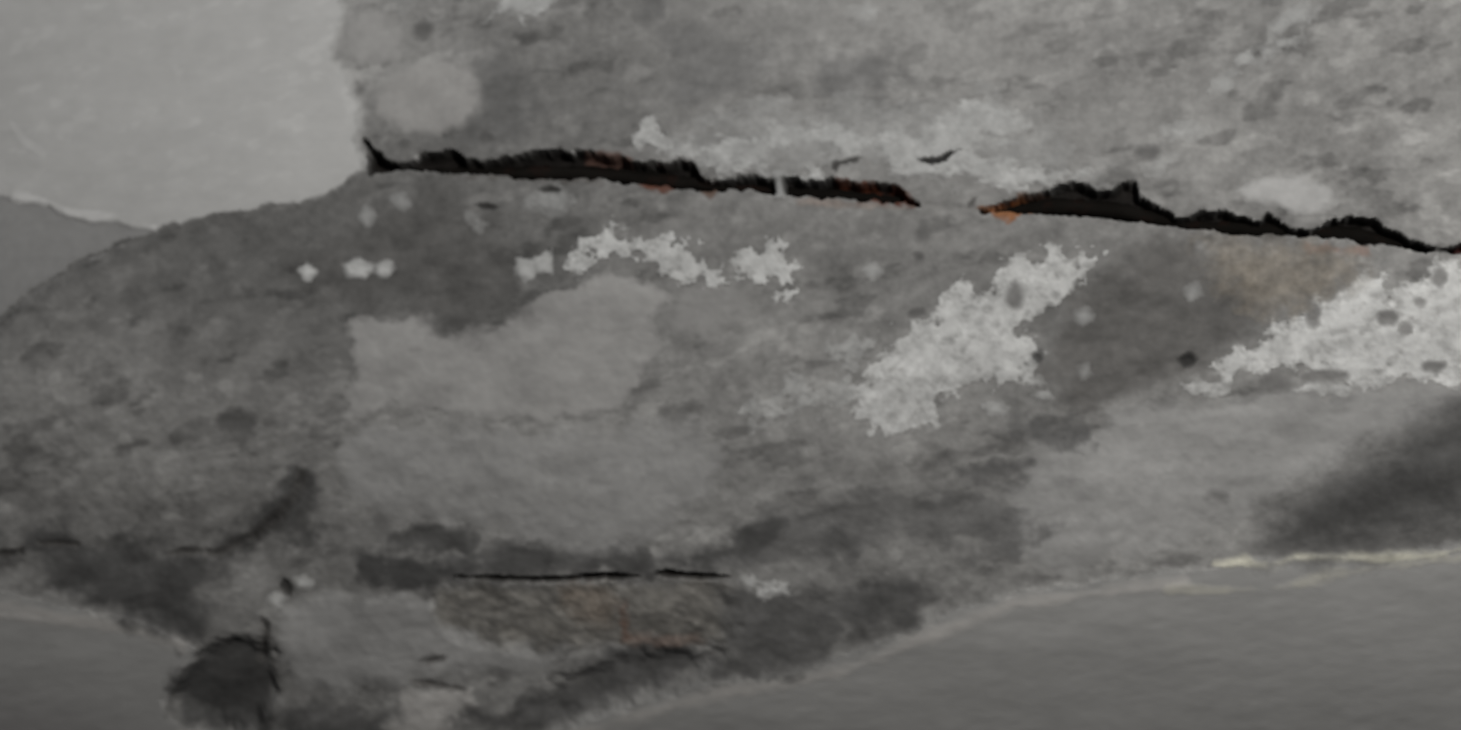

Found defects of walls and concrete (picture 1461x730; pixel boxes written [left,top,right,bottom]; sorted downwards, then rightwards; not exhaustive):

crack [362,136,921,212]
spalling [0,0,1461,556]
crack [917,148,963,166]
crack [967,179,1461,255]
spalling [0,403,427,712]
crack [454,568,731,584]
water stain [347,215,1271,730]
spalling [416,529,1357,730]